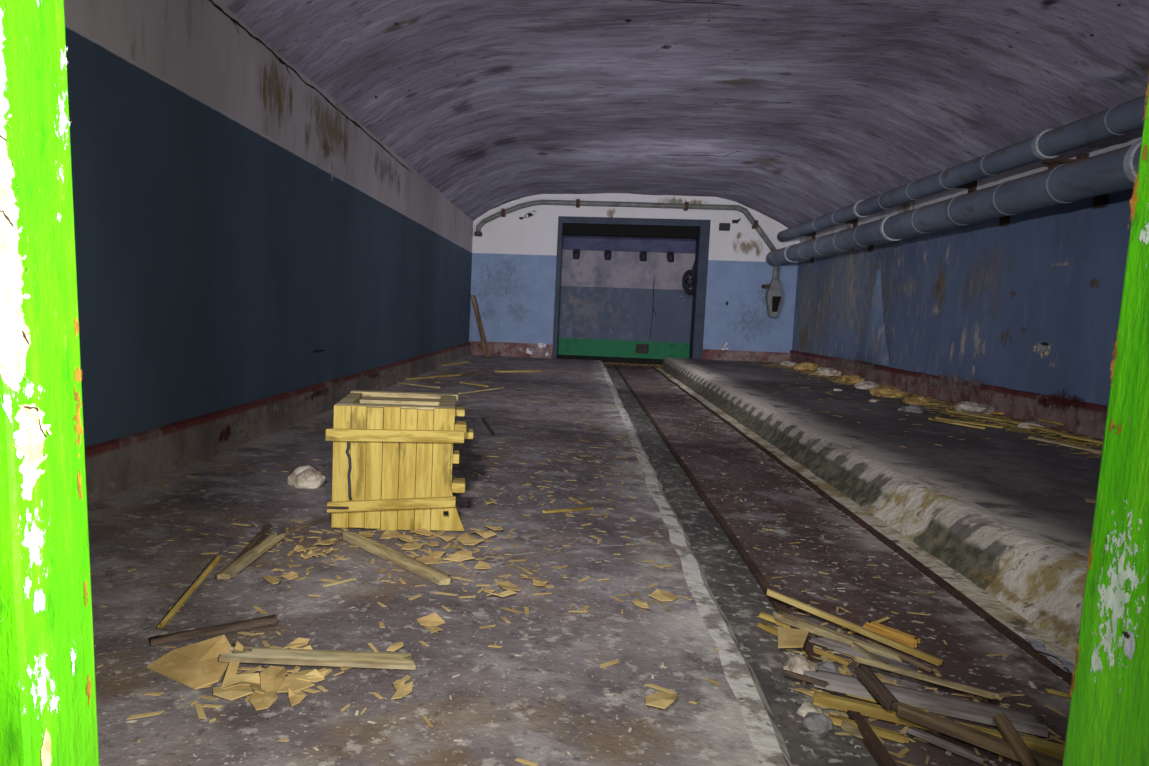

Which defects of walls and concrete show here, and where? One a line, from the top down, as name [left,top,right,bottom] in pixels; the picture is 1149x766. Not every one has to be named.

spalling [56,90,70,150]
crack [209,0,410,171]
crack [655,0,743,8]
spalling [0,7,51,613]
spalling [1139,221,1149,244]
spalling [1090,499,1148,682]